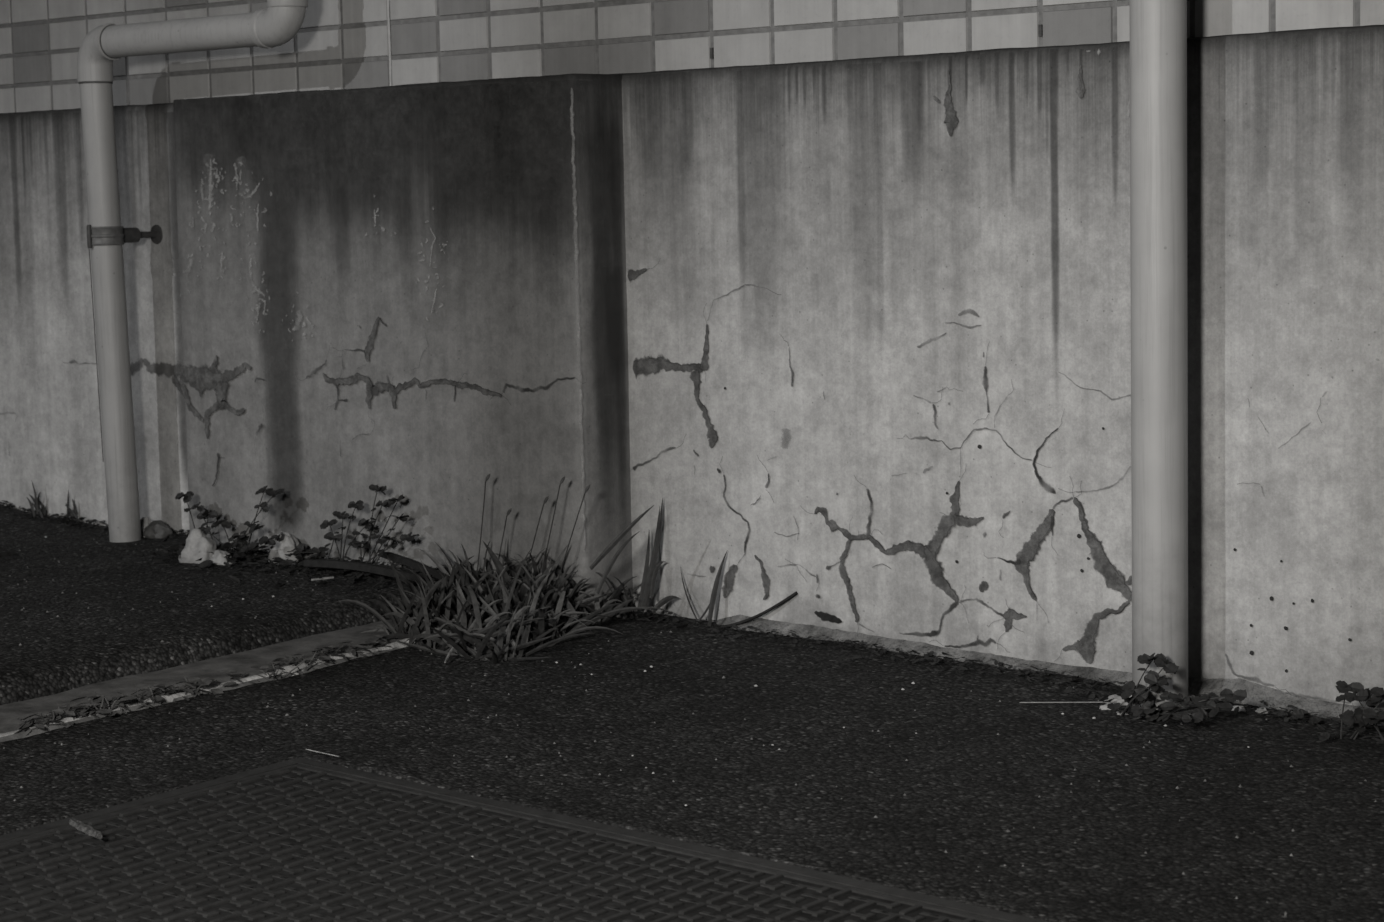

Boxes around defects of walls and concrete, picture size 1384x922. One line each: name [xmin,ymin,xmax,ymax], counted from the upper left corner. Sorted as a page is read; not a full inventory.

water stain [265,216,296,524]
water stain [189,79,624,460]
crack [306,316,575,410]
crack [633,324,750,563]
crack [786,352,1132,664]